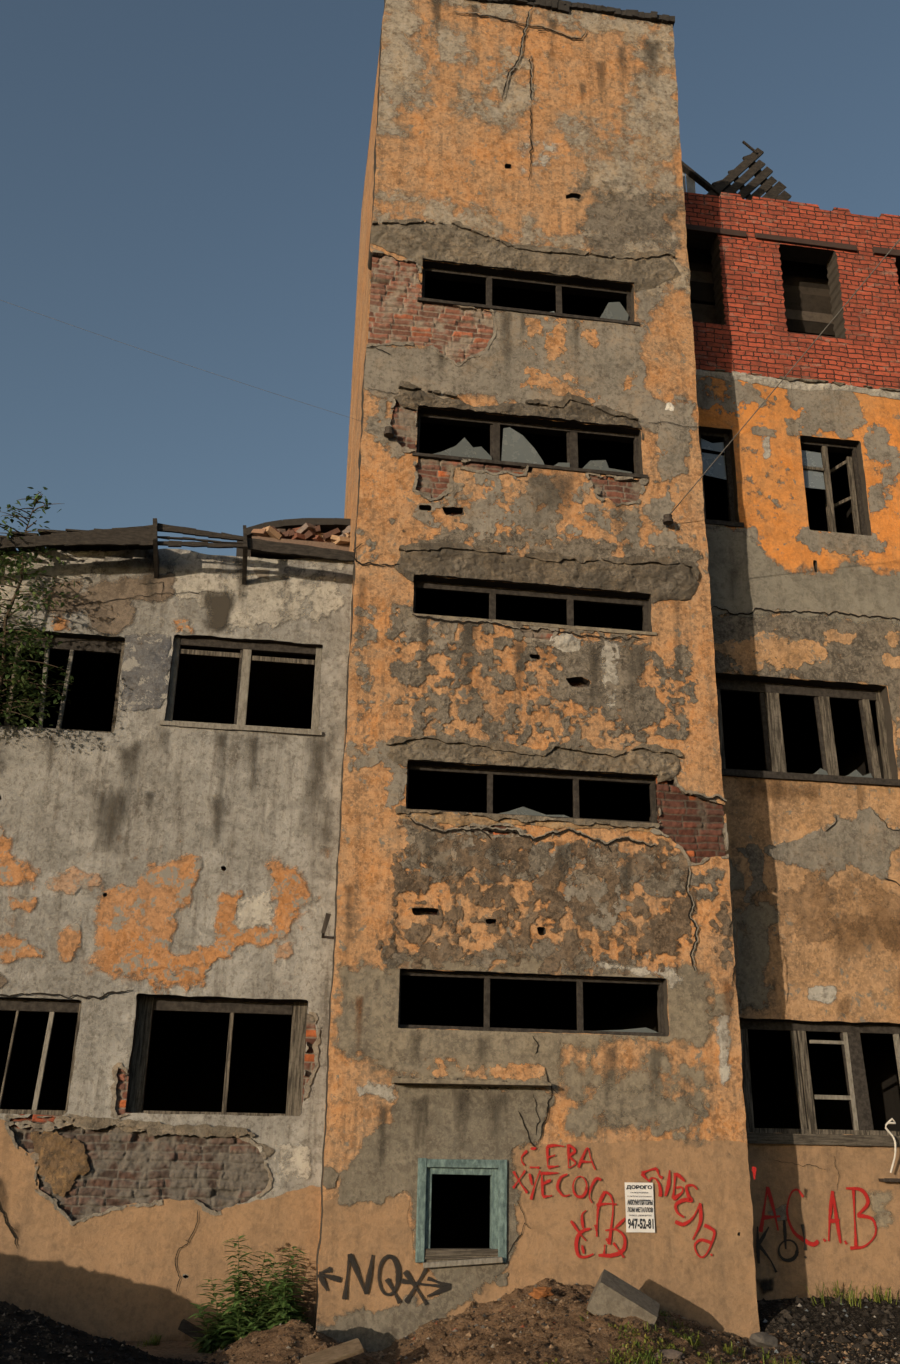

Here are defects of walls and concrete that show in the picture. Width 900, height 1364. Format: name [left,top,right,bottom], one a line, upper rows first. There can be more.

crack [456,7,586,180]
peeling [363,0,900,770]
peeling [356,528,378,562]
crack [711,605,900,621]
crack [406,815,657,852]
peeling [0,550,900,1352]
crack [518,1037,556,1147]
crack [0,1208,18,1249]
crack [175,1211,198,1291]